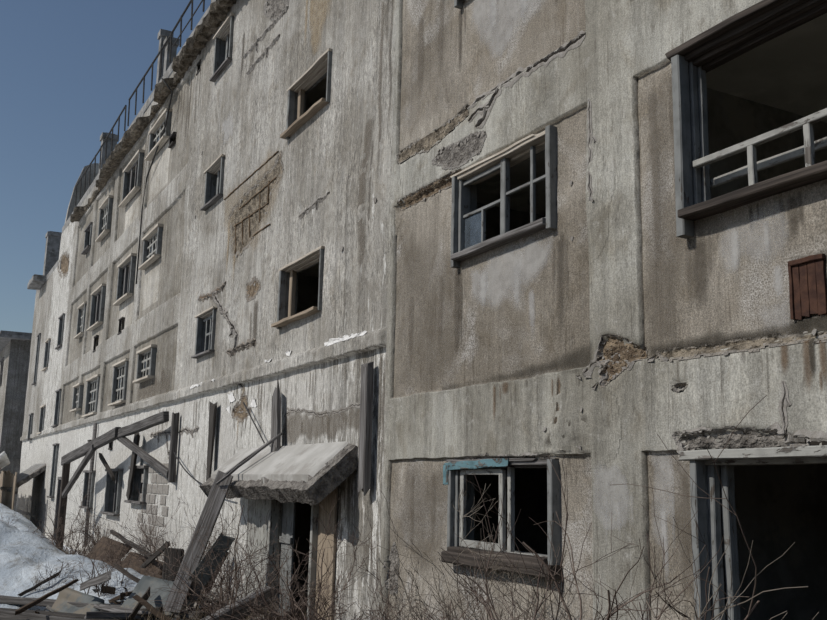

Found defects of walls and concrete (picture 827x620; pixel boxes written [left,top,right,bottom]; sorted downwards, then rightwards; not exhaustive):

leakage [359,1,393,205]
crack [467,30,585,129]
spalling [396,104,486,211]
spalling [224,151,284,258]
spalling [57,251,69,279]
crack [198,281,256,357]
leakage [454,272,462,339]
spalling [225,380,257,423]
leakage [516,349,590,376]
spalling [671,382,688,393]
spalling [576,329,827,390]
spalling [672,426,811,454]